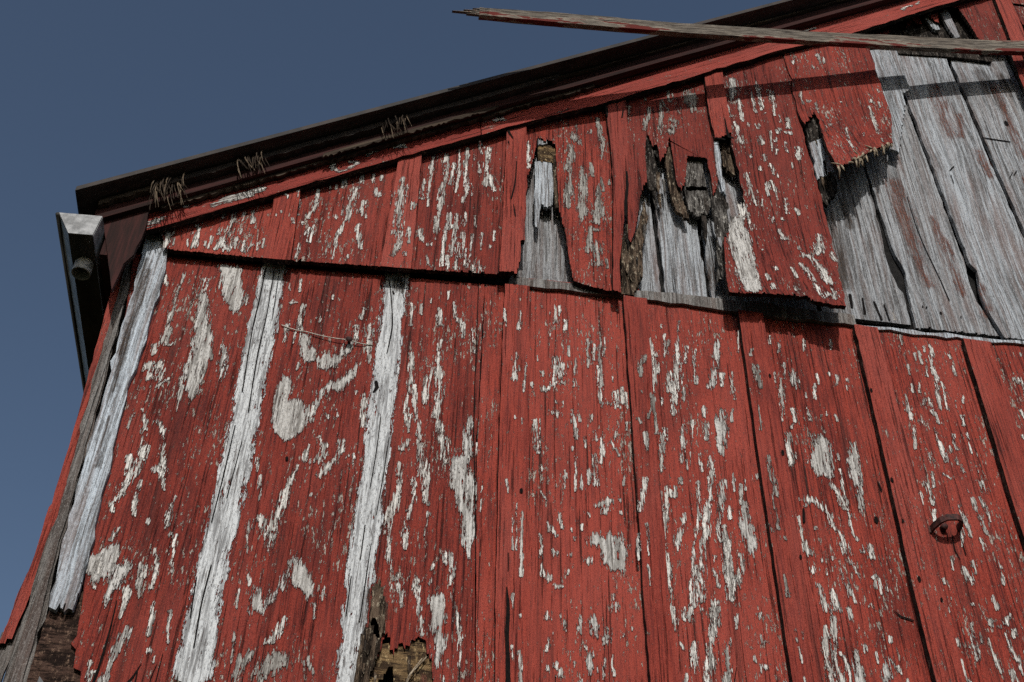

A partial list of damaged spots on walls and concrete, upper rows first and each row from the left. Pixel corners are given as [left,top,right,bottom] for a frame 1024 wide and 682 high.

peeling [562,117,611,269]
peeling [726,77,840,300]
peeling [863,89,884,142]
peeling [85,140,496,682]
crack [472,281,480,574]
crack [504,553,512,682]
peeling [541,304,578,336]
peeling [510,320,787,682]
peeling [736,330,910,682]
peeling [903,344,1005,586]
peeling [956,594,1024,682]